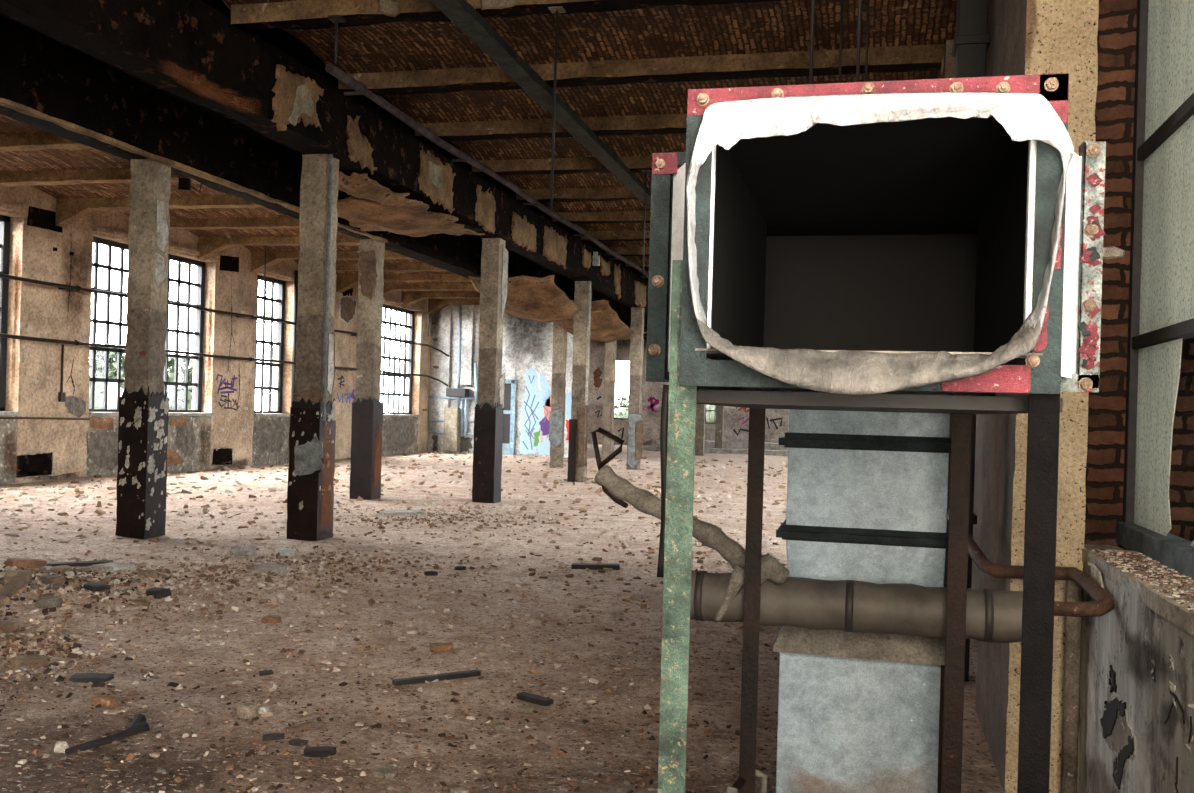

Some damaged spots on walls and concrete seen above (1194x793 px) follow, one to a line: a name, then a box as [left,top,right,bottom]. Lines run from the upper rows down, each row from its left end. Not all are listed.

flaking render [271,64,324,131]
flaking render [347,115,377,175]
flaking render [418,146,456,214]
flaking render [475,184,496,234]
spalling [339,249,379,325]
flaking render [501,212,568,324]
flaking render [582,245,647,308]
peeling [242,332,336,495]
peeling [63,394,198,531]
peeling [1100,665,1136,792]
crack [1149,653,1194,793]